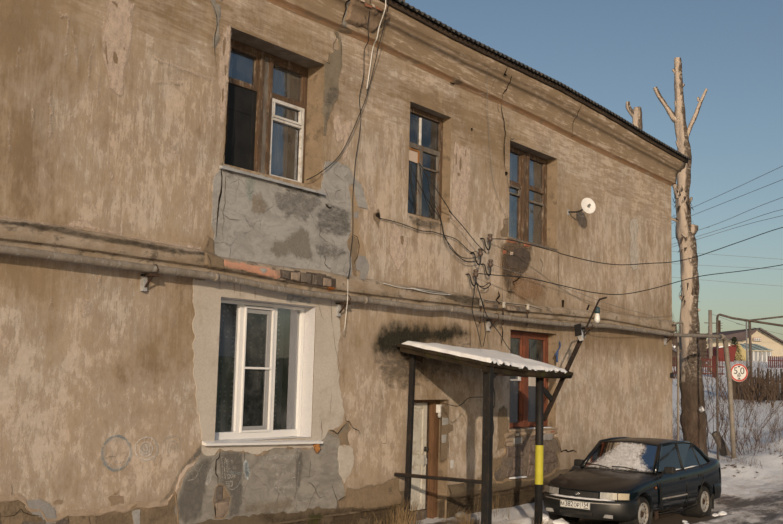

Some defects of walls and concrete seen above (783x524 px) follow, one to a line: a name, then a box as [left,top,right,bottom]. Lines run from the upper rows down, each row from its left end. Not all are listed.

peeling [102,0,134,95]
crack [208,0,221,59]
crack [327,0,351,64]
crack [216,99,229,236]
crack [491,65,512,192]
spalling [223,260,336,289]
peeling [347,187,369,280]
spalling [484,218,531,314]
leakage [380,330,453,350]
spalling [0,447,201,524]
spalling [328,418,402,509]
spalling [492,407,561,485]